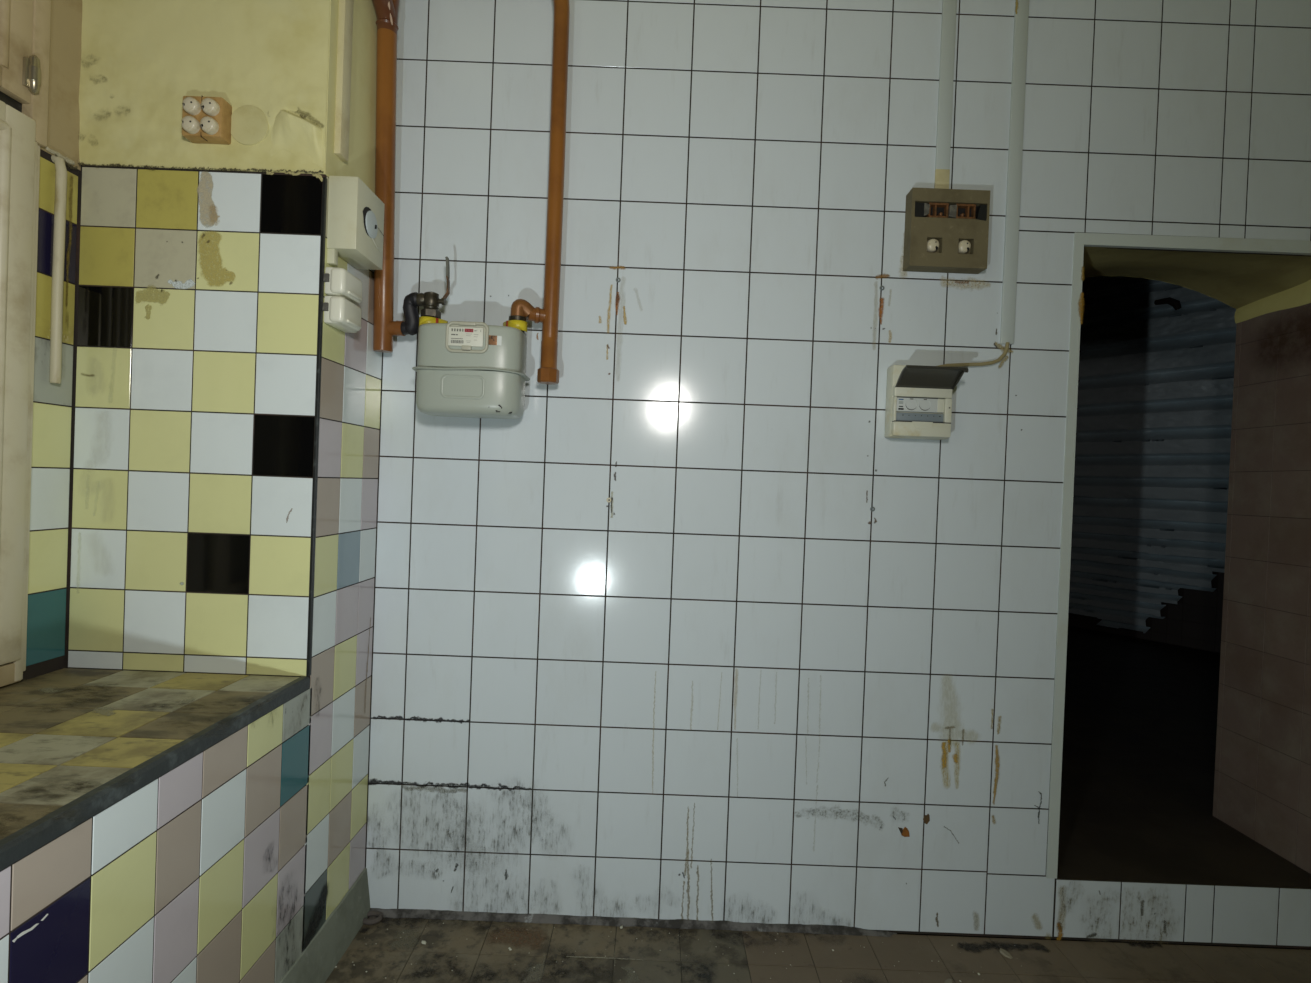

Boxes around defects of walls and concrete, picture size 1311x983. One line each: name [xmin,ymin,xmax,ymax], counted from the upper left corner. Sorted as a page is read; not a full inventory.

peeling [136,172,235,319]
corrosion [599,286,627,375]
damp [368,779,530,807]
corrosion [942,727,963,768]
corrosion [992,709,1000,823]